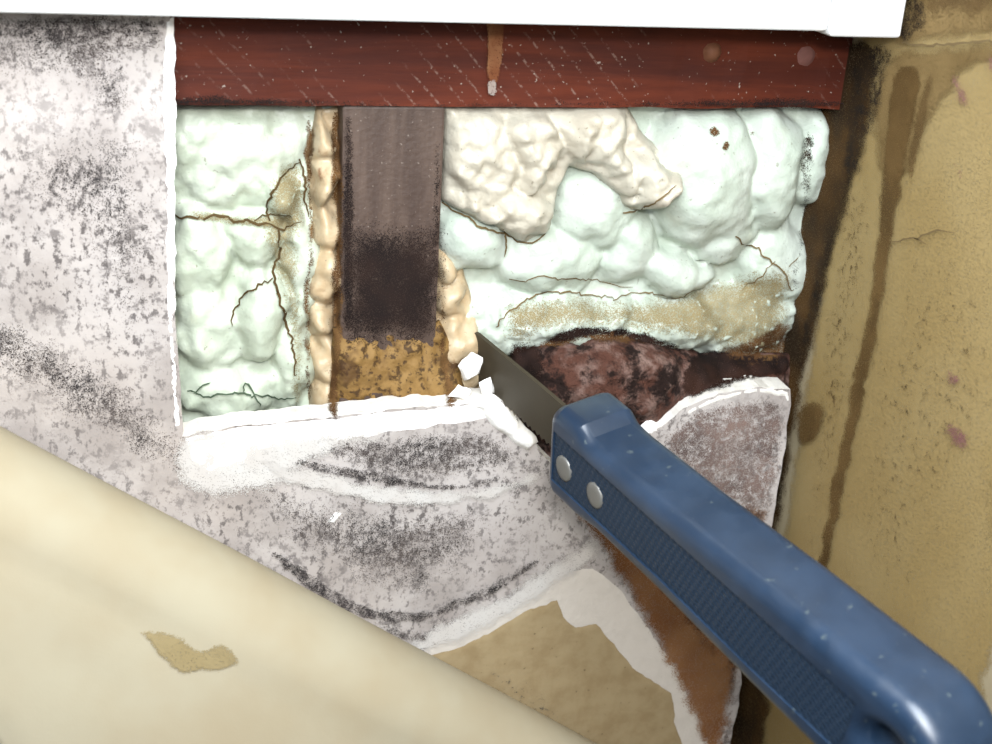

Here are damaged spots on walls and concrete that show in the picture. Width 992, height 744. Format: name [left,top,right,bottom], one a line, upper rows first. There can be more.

mould [0,15,164,120]
crack [902,39,992,47]
mould [17,126,157,330]
mould [0,323,187,469]
leakage [505,0,992,700]
mould [295,430,517,490]
mould [252,493,489,595]
mould [272,552,540,644]